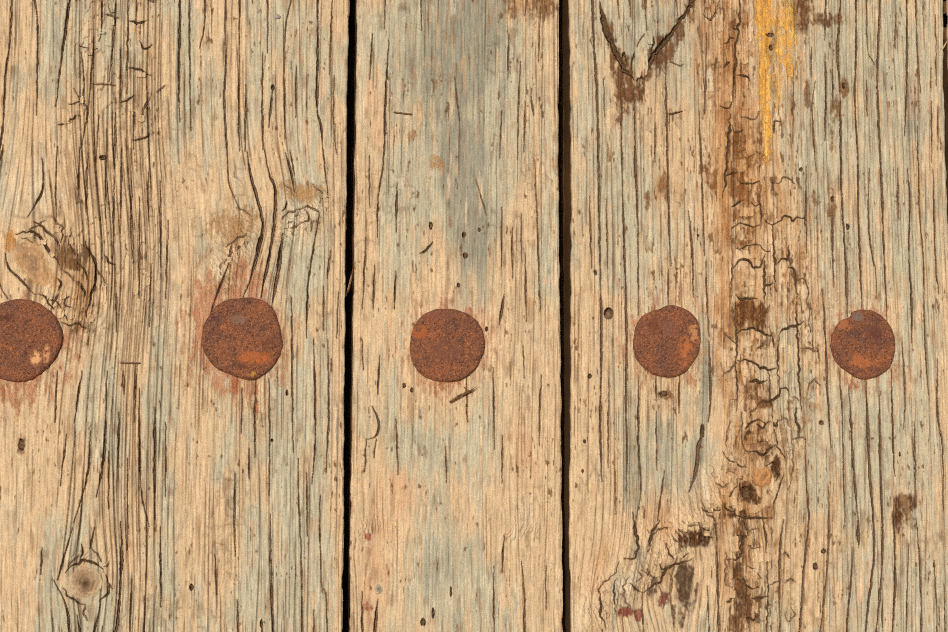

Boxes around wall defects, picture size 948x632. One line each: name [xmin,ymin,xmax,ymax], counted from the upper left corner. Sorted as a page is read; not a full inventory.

crack [362,0,398,309]
crack [0,0,339,632]
rust [175,258,272,397]
crack [362,339,399,472]
crack [589,0,946,632]
crack [361,592,378,632]